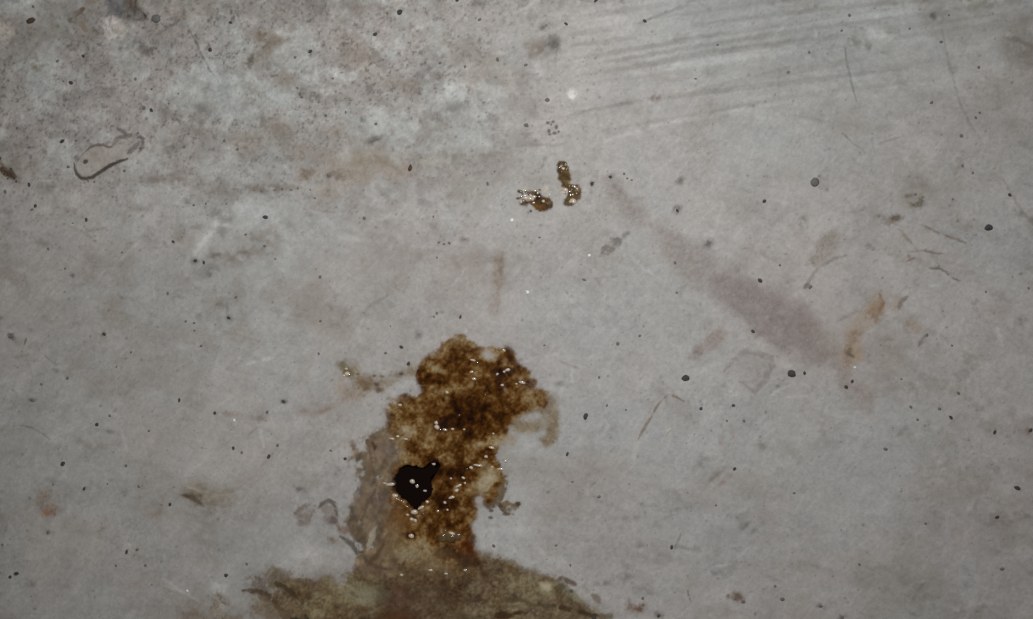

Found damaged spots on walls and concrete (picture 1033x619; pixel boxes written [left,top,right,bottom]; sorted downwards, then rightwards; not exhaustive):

water stain [242,334,613,619]